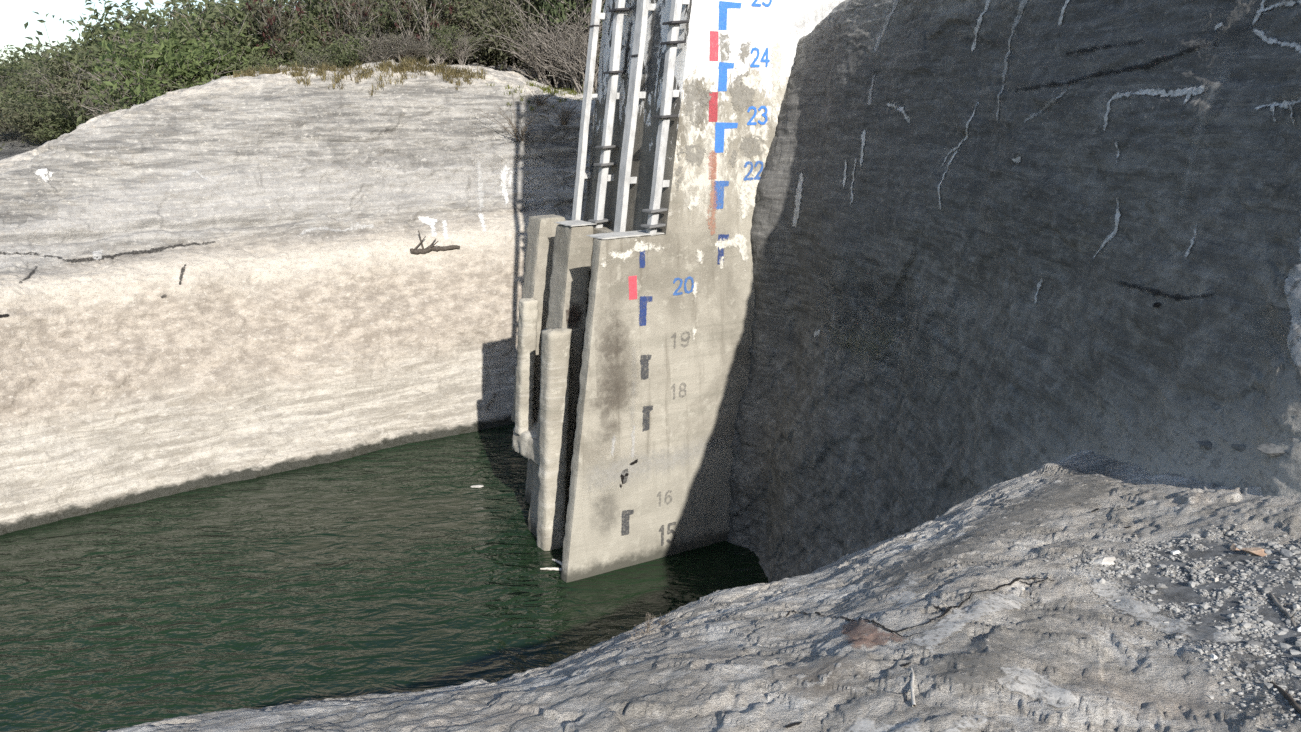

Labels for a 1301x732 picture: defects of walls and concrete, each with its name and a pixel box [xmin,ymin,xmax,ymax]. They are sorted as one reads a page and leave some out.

leakage [604,340,622,455]